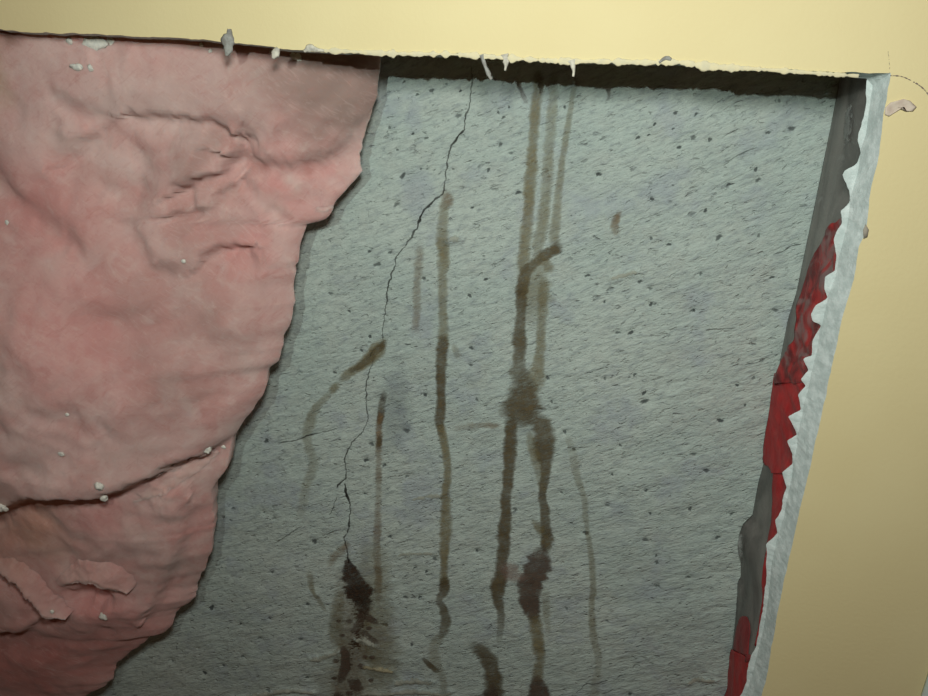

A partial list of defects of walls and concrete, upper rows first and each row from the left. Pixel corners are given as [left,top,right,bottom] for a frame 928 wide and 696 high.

crack [386,112,468,304]
leakage [437,238,448,269]
leakage [347,342,385,375]
leakage [490,99,560,696]
crack [337,419,368,560]
leakage [435,337,450,633]
leakage [332,559,377,696]
leakage [475,646,504,696]